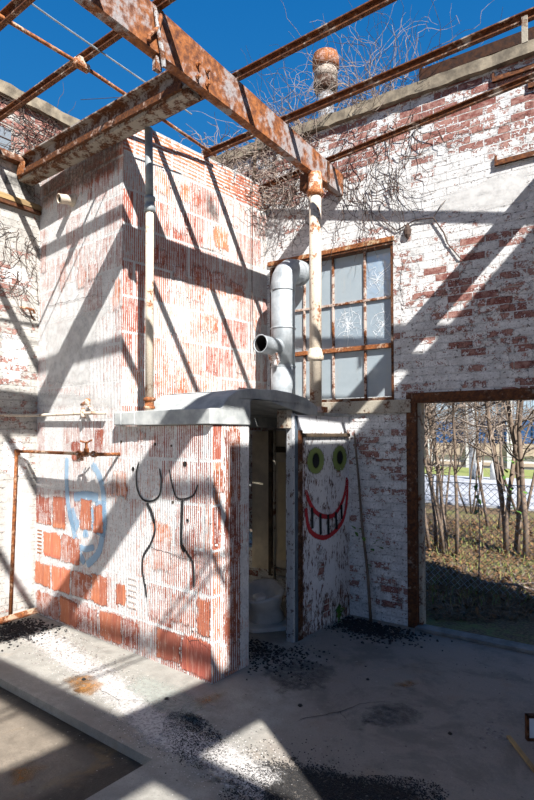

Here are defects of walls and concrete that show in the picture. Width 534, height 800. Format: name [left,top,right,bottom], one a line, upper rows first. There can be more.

flaking render [363,84,534,184]
peeling [154,248,244,303]
flaking render [399,233,534,335]
peeling [253,300,263,334]
peeling [131,366,142,394]
peeling [155,332,190,395]
peeling [199,368,216,392]
corrosion [70,676,100,692]